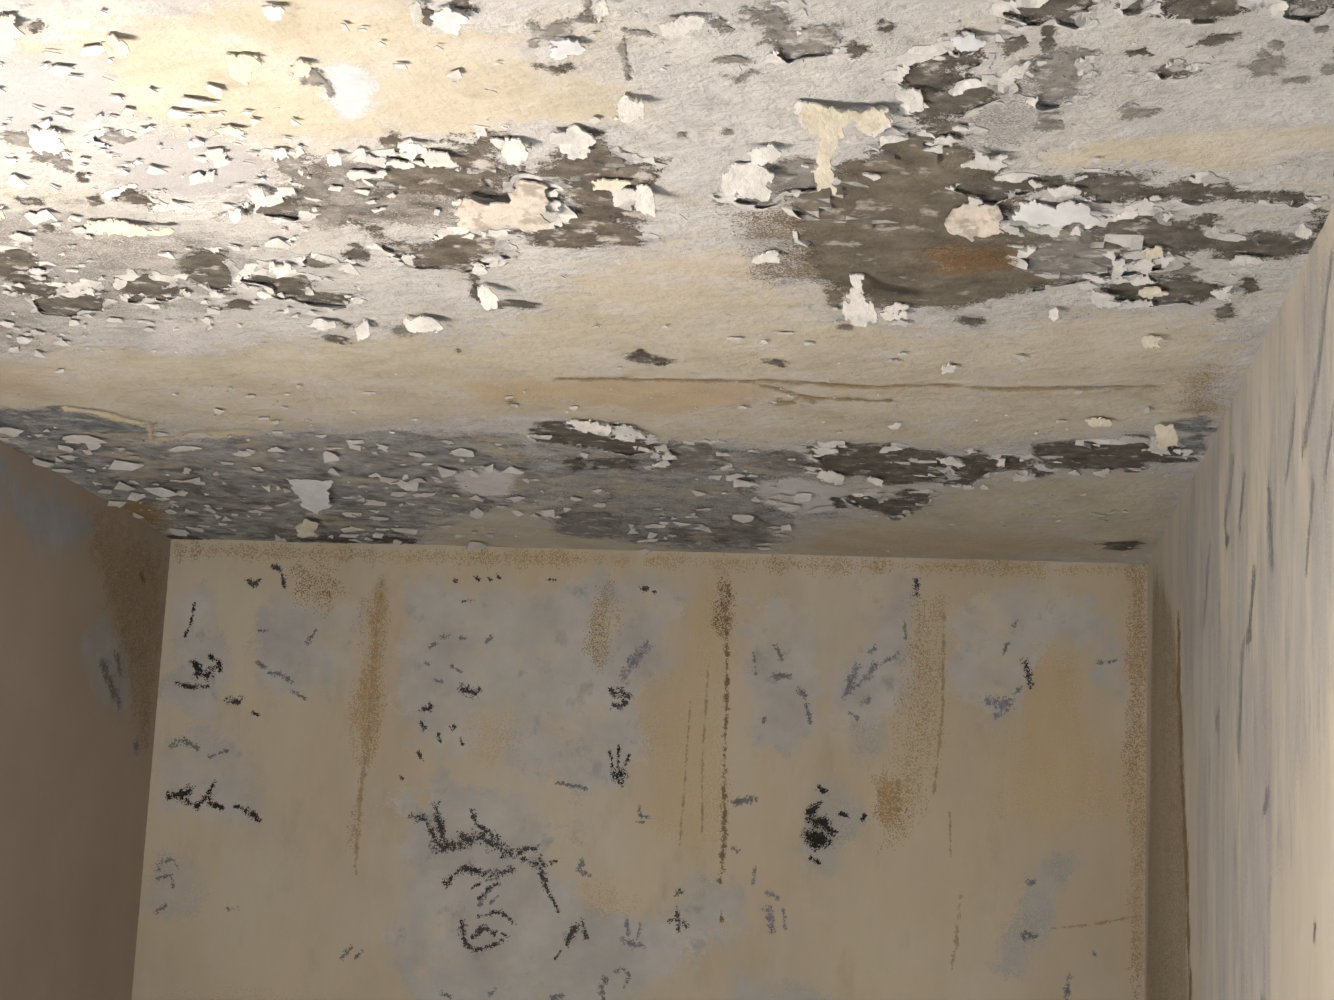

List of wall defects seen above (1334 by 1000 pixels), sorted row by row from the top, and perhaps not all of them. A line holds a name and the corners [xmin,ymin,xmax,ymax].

peeling [0,0,1334,556]
damp [713,194,894,309]
damp [1284,248,1333,486]
spalling [1246,477,1274,649]
damp [1305,400,1334,576]
damp [86,493,1189,1000]
damp [1236,637,1245,764]